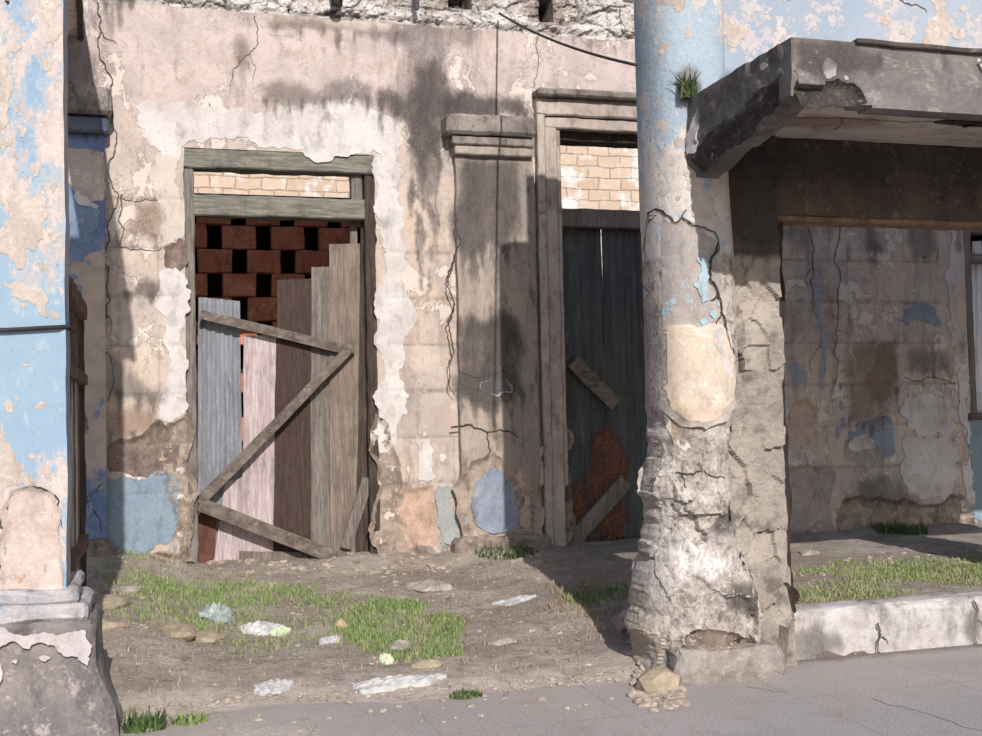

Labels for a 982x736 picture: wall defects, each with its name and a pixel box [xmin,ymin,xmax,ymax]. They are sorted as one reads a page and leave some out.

peeling [922,0,965,46]
crack [97,2,162,401]
leakage [271,61,526,244]
leakage [452,162,518,273]
crack [641,208,734,354]
leakage [456,311,524,426]
spalling [0,423,63,591]
crack [451,424,518,457]
rust [572,427,628,523]
rust [595,498,626,541]
spalling [787,367,982,533]
spalling [685,629,759,650]